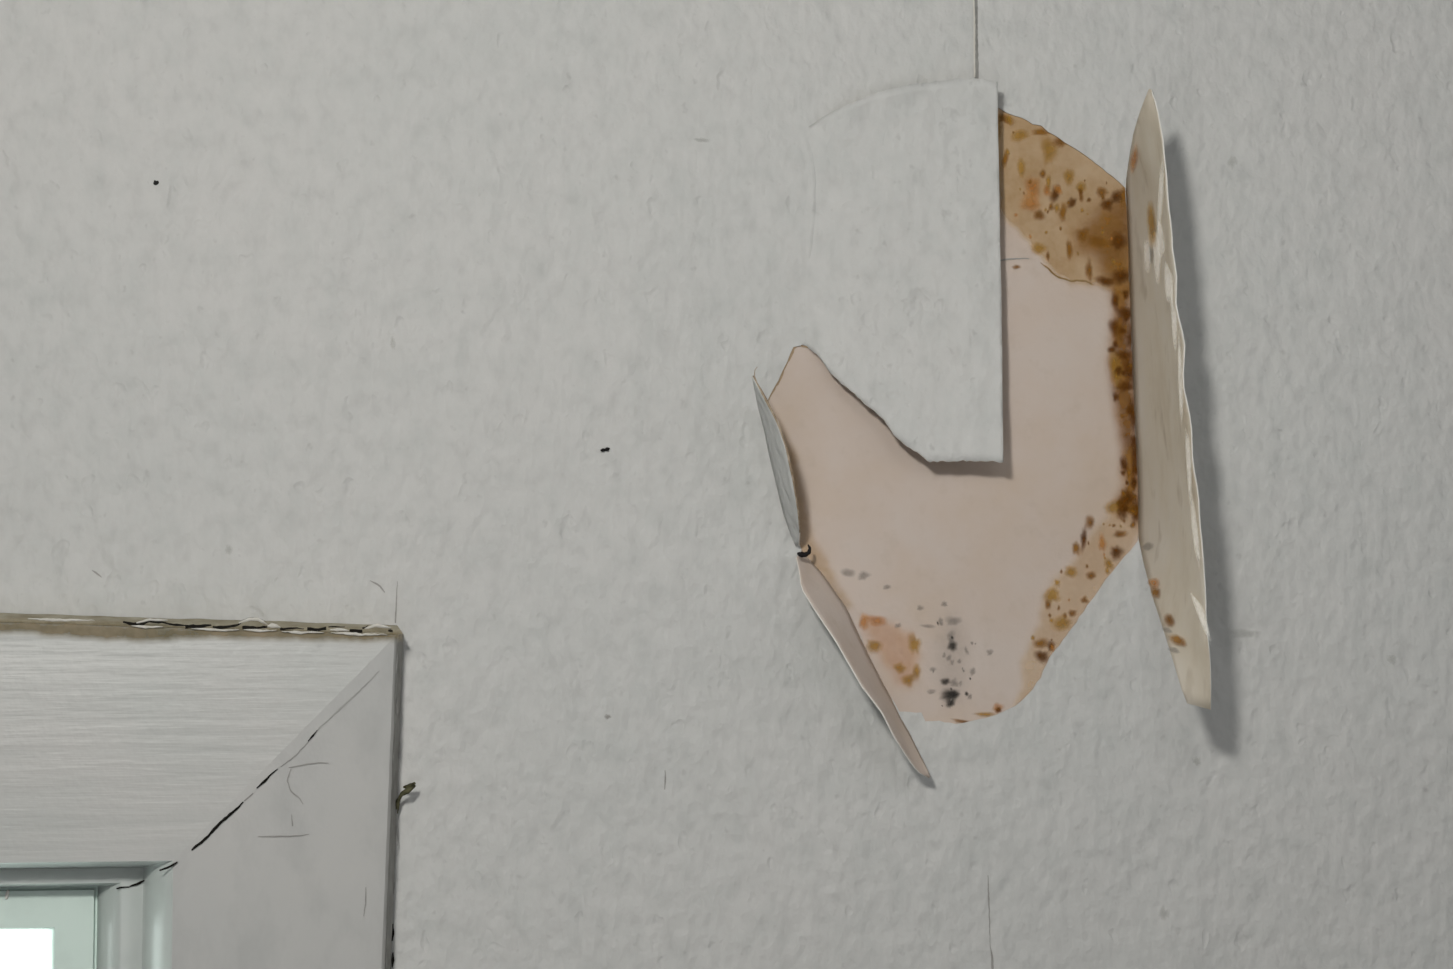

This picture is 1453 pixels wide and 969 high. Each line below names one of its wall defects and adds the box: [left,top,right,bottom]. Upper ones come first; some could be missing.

water stain [998,110,1171,661]
crack [28,580,398,636]
water stain [861,618,881,650]
water stain [896,638,919,684]
water stain [942,678,1001,723]
crack [116,671,400,889]
crack [363,883,395,968]